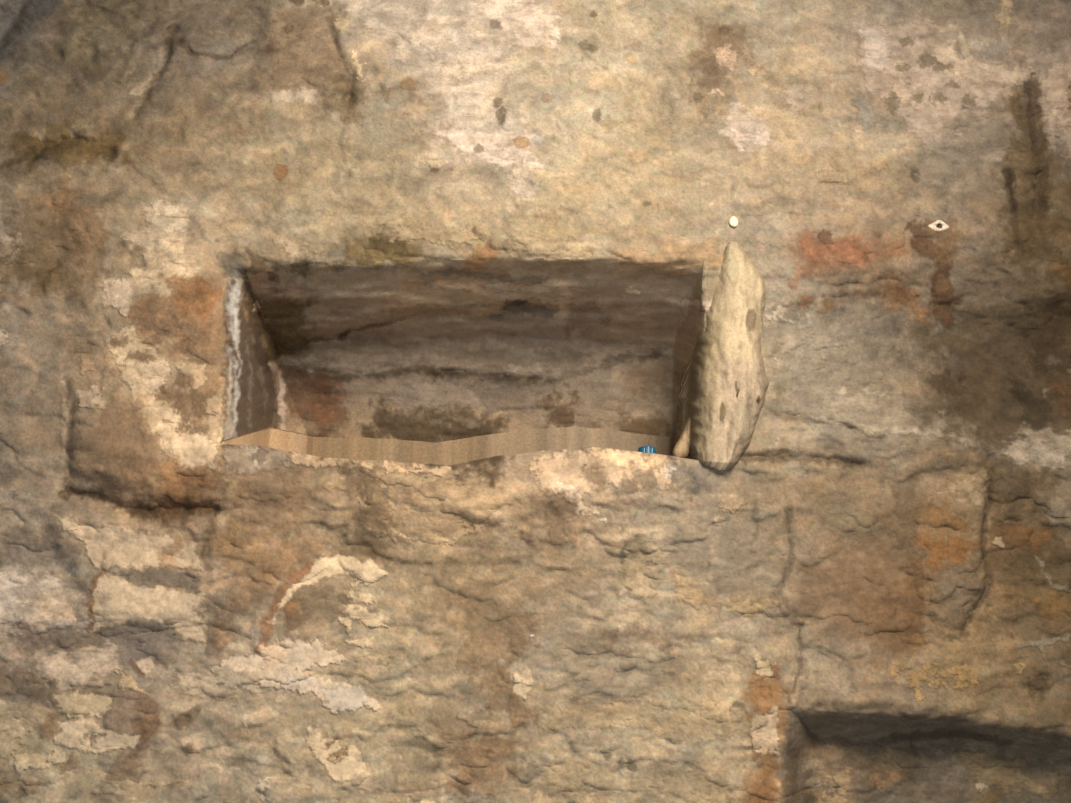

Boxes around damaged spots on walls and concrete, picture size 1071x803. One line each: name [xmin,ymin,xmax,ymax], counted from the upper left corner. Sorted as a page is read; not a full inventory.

corrosion [793,220,960,328]
peeling [173,554,392,728]
crack [775,508,827,714]
crack [962,471,996,634]
crack [1018,633,1071,667]
crack [1036,557,1071,591]
peeling [0,656,161,796]
peeling [307,725,379,797]